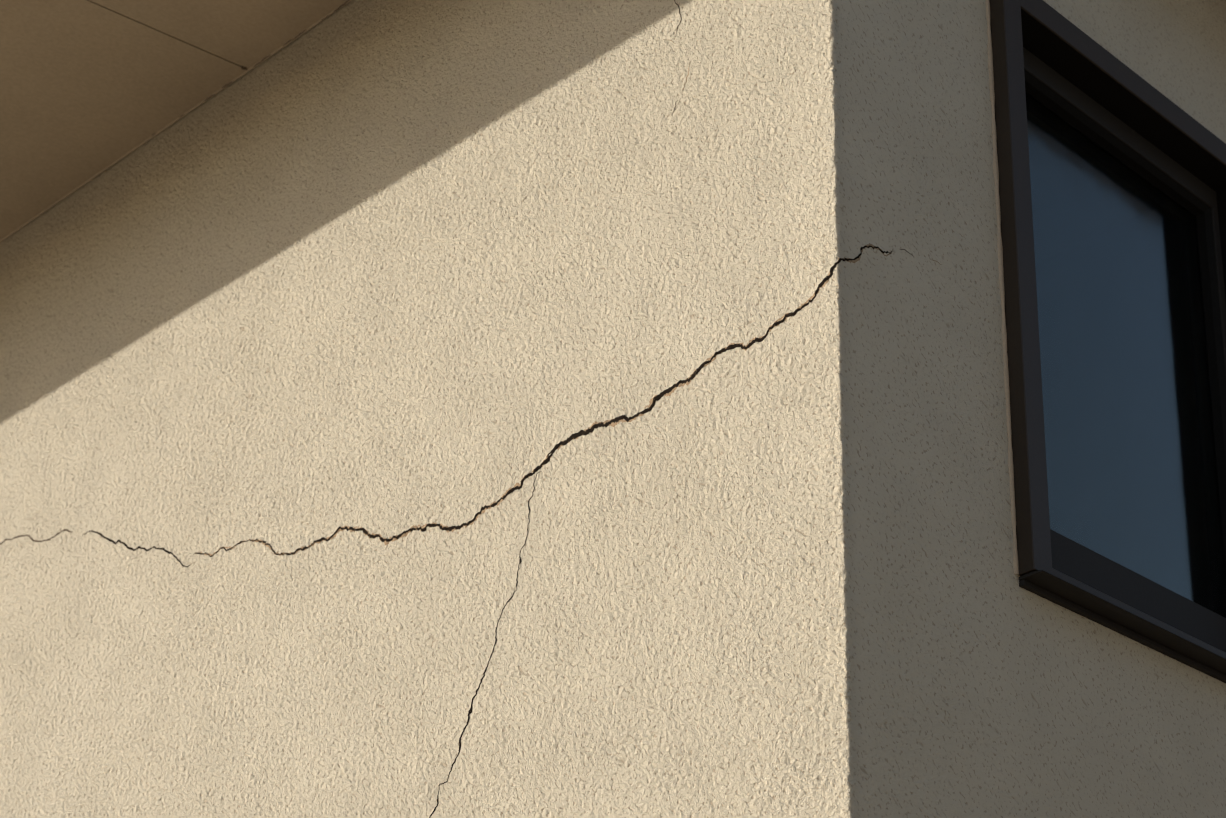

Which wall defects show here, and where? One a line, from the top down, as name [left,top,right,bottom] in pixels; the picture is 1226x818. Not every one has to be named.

crack [0,243,941,818]